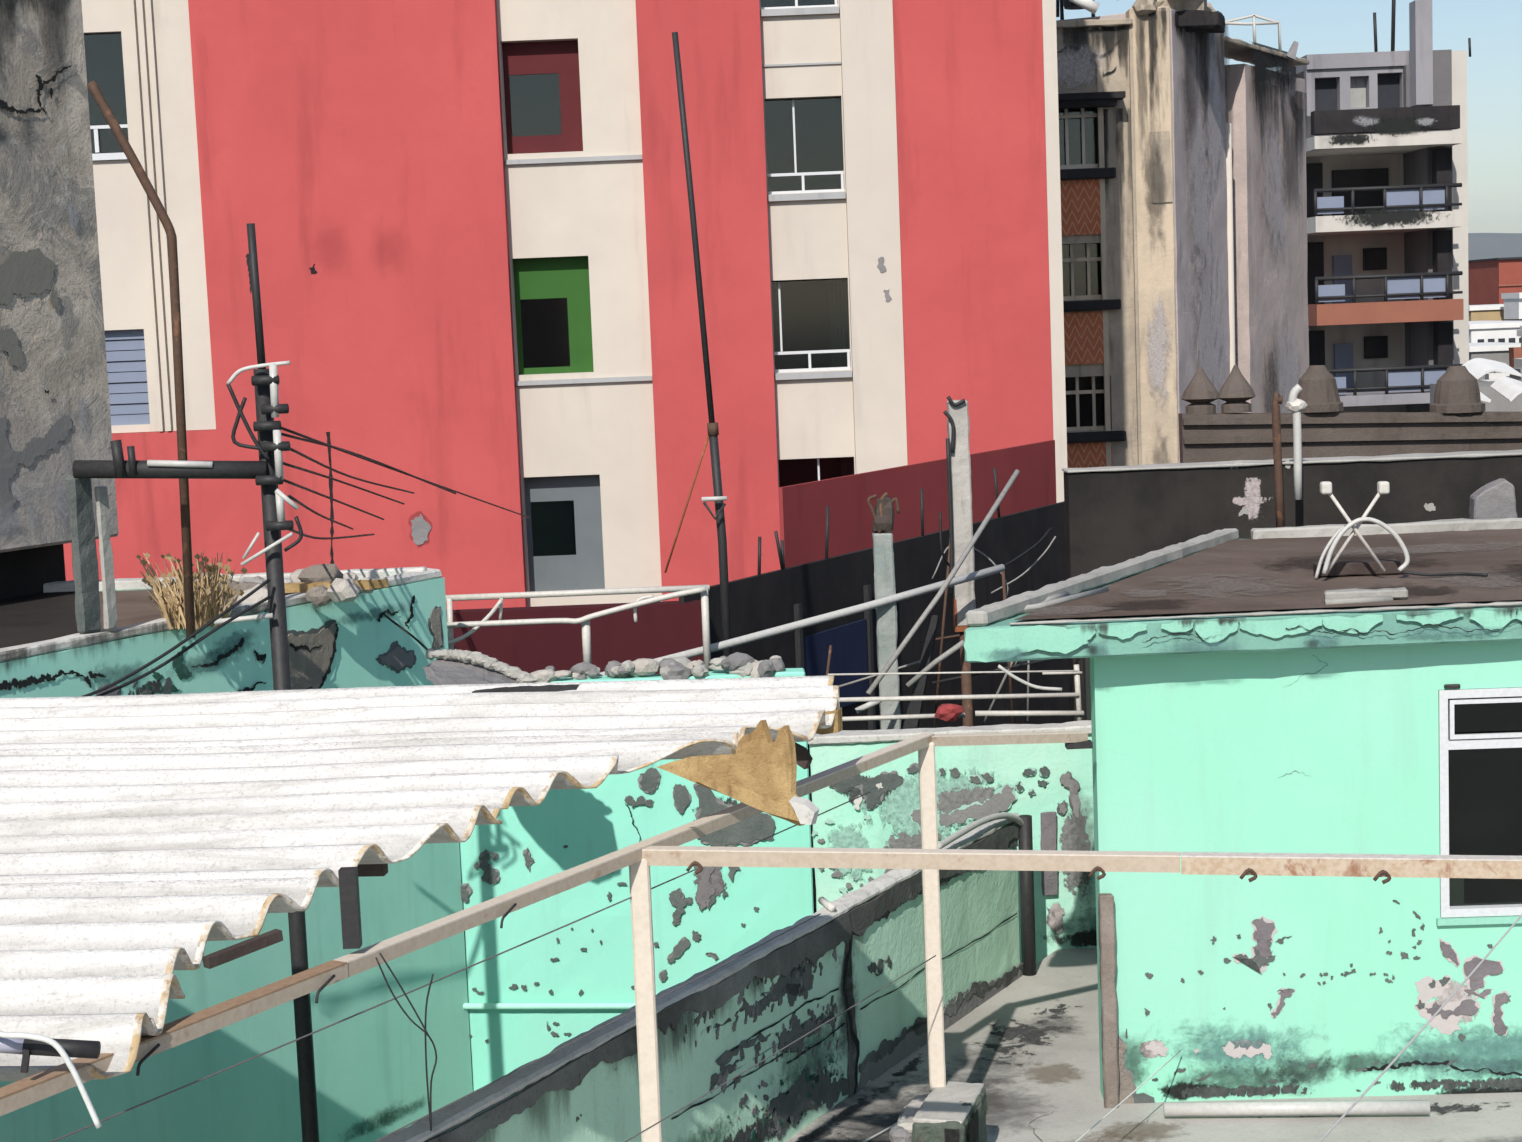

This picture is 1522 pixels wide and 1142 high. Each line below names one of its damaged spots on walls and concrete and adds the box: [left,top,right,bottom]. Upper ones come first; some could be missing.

crack [0,65,72,114]
damp [1057,46,1099,89]
damp [1251,42,1297,252]
damp [1270,324,1300,413]
spalling [287,619,339,690]
peeling [964,609,1522,662]
spalling [624,768,775,847]
peeling [812,762,1091,851]
peeling [654,866,982,1142]
crack [671,913,1017,1120]
damp [1125,1030,1328,1100]
damp [1347,1032,1522,1115]